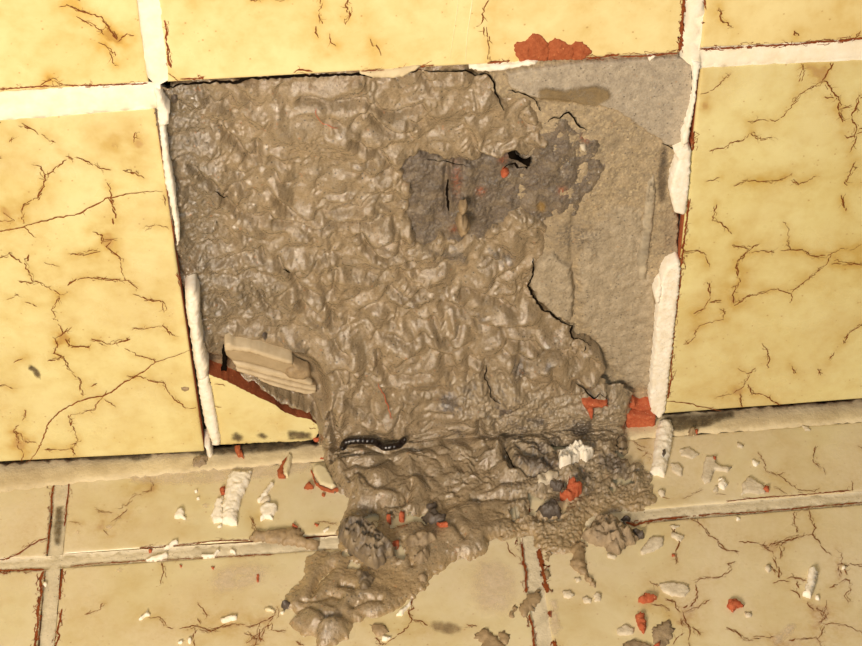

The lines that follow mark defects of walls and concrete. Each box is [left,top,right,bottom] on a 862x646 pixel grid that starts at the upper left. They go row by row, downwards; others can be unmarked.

crack [510,90,586,130]
crack [0,191,159,232]
peeling [402,33,692,428]
crack [527,259,591,351]
crack [26,349,192,463]
spalling [209,360,319,459]
peeling [536,470,558,485]